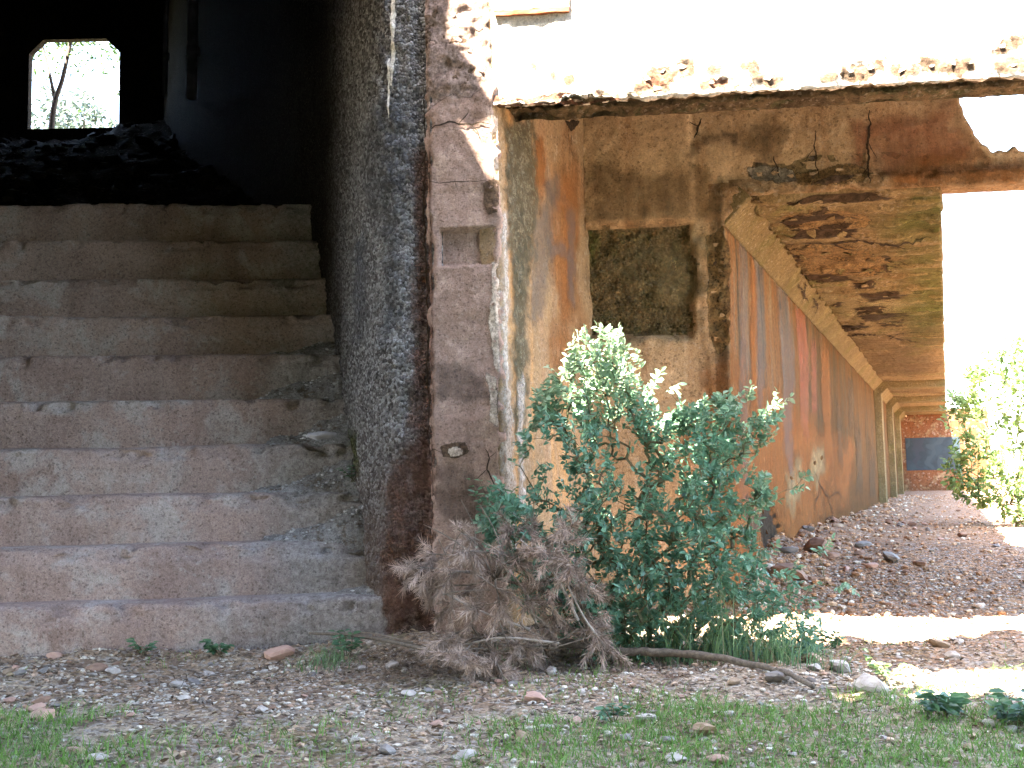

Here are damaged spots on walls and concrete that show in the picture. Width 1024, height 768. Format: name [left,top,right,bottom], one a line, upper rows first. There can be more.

leakage [387,0,396,118]
crack [413,86,492,453]
peeling [486,262,501,428]
leakage [499,215,526,502]
rust [536,139,578,320]
spalling [483,58,792,232]
crack [805,130,819,178]
spalling [747,163,908,332]
crack [863,110,877,182]
spalling [817,54,976,84]